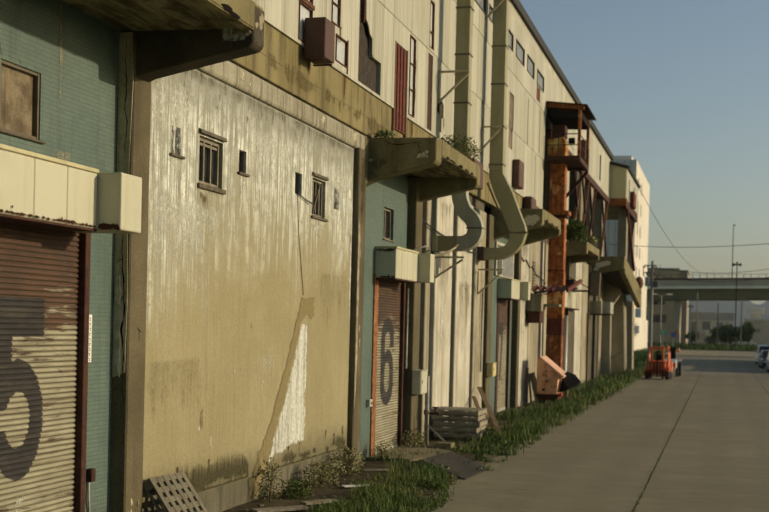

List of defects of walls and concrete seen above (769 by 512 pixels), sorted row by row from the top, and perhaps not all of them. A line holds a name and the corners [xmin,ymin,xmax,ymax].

crack [121,41,129,146]
corrosion [0,205,120,230]
peeling [253,297,314,476]
leakage [176,426,346,499]